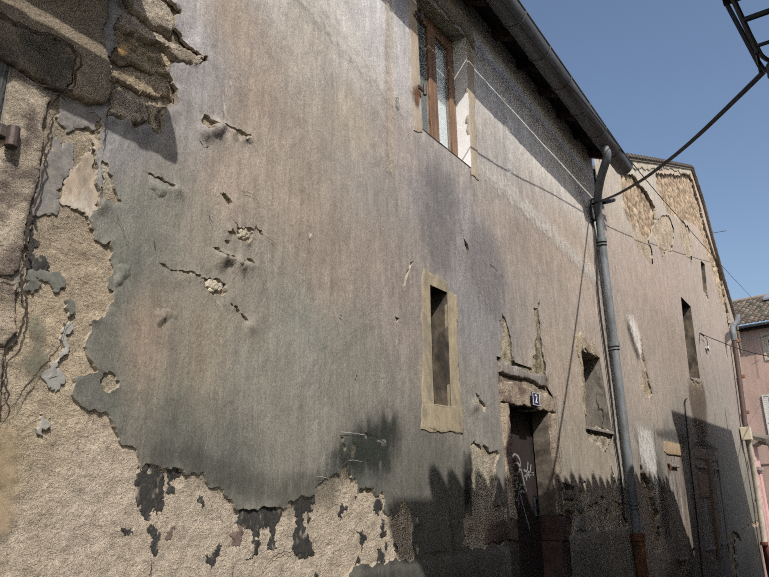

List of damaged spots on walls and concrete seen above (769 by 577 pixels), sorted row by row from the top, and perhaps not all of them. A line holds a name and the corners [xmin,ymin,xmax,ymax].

crack [102,96,113,148]
crack [0,12,83,410]
flaking render [0,0,419,577]
flaking render [620,172,730,330]
flaking render [497,313,516,365]
flaking render [528,301,547,380]
leakage [334,414,399,473]
flaking render [462,441,507,550]
flaking render [562,466,628,535]
flaking render [640,464,663,554]